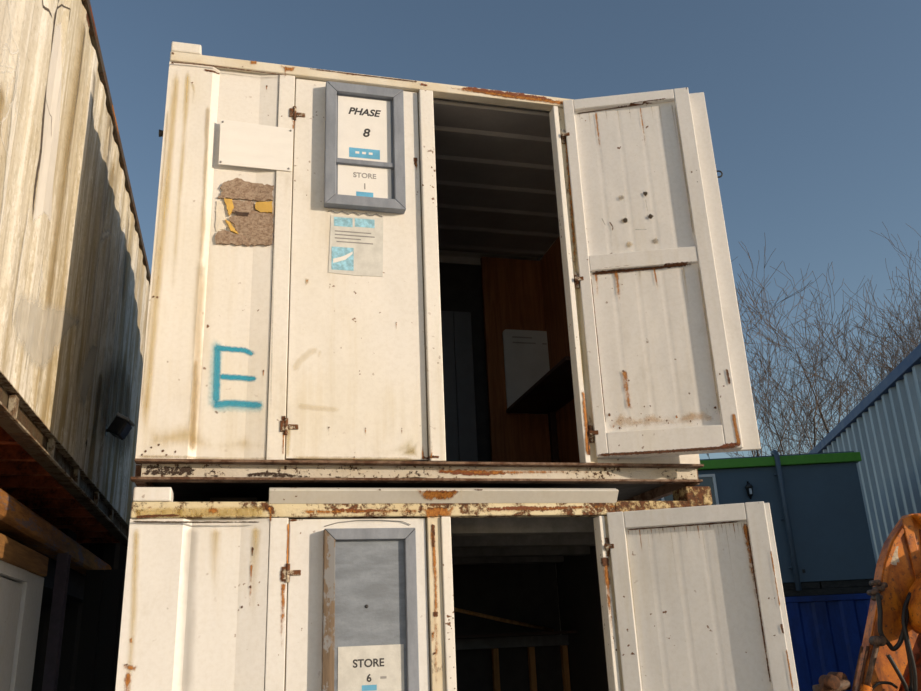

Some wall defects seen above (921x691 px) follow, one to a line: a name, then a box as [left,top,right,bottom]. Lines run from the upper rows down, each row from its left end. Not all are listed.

leakage [0,2,22,234]
leakage [62,33,85,193]
peeling [215,178,274,247]
rust [565,132,576,255]
rust [591,262,691,422]
rust [582,392,741,456]
rust [280,519,297,633]
rust [306,490,458,638]
rust [601,557,611,610]
rust [628,521,784,681]